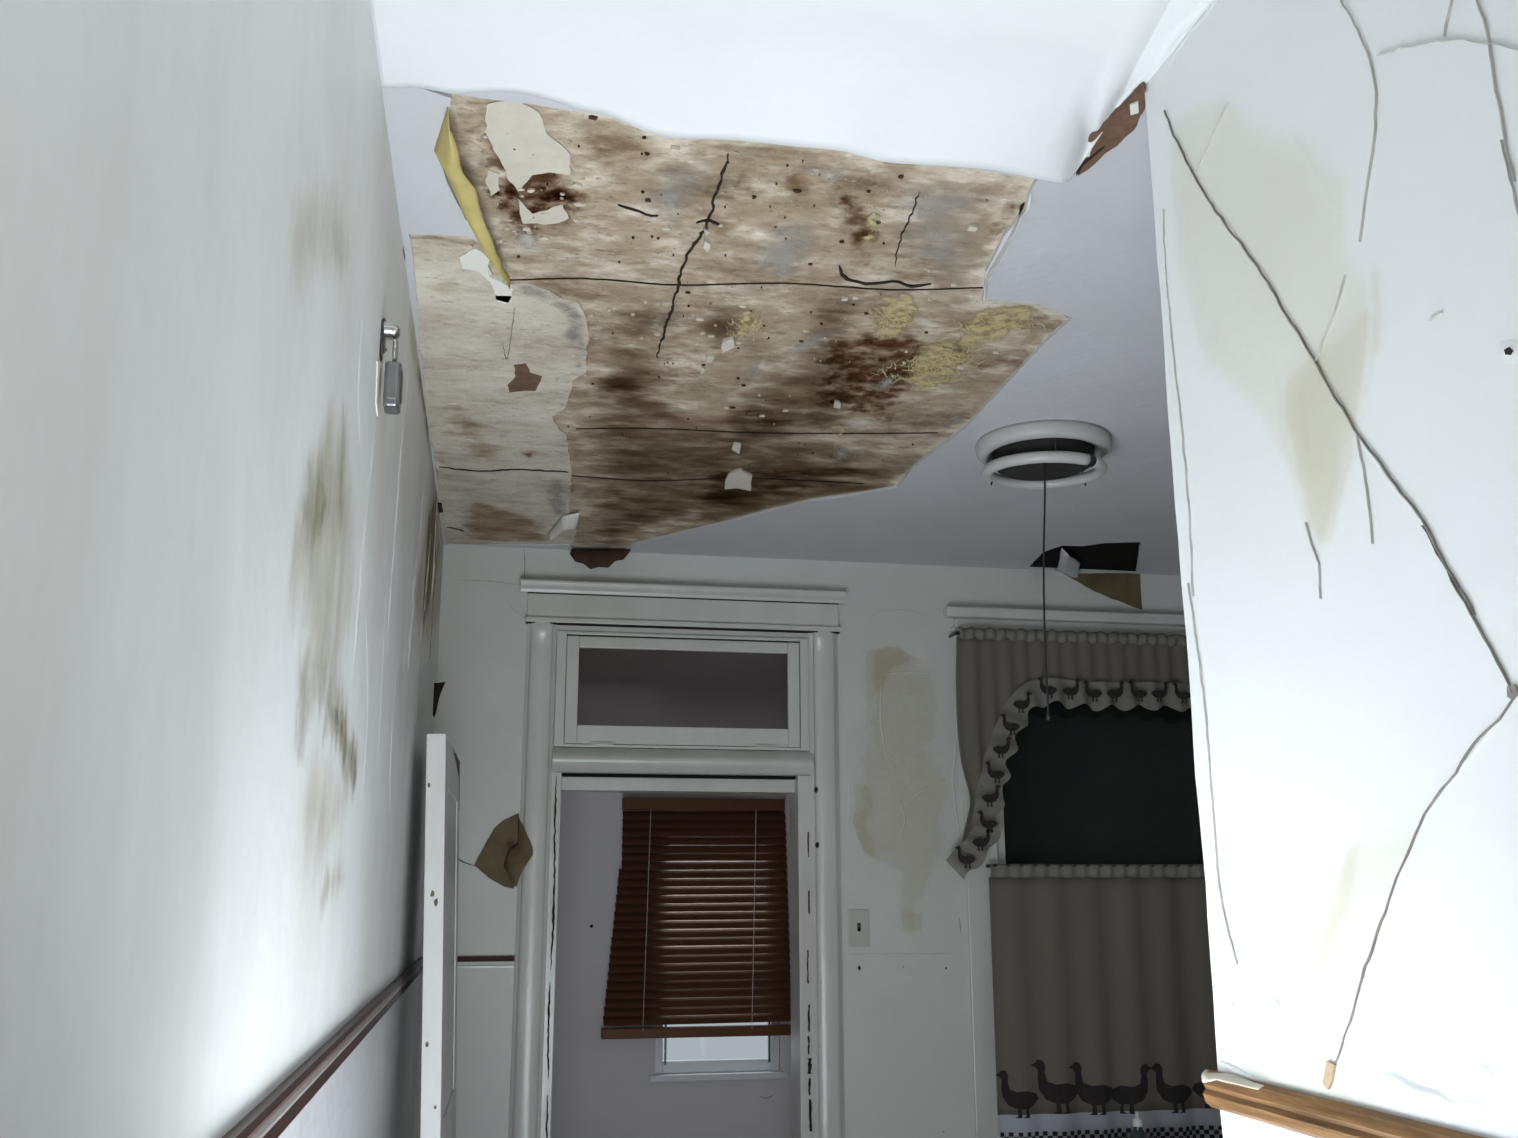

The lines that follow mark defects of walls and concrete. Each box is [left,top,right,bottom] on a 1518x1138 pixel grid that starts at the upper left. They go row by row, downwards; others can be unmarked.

flaking render [703,226,726,257]
flaking render [411,236,594,546]
flaking render [701,336,739,375]
flaking render [711,441,752,491]
crack [1163,0,1518,1098]
flaking render [459,813,533,889]
peeling [546,776,557,1138]